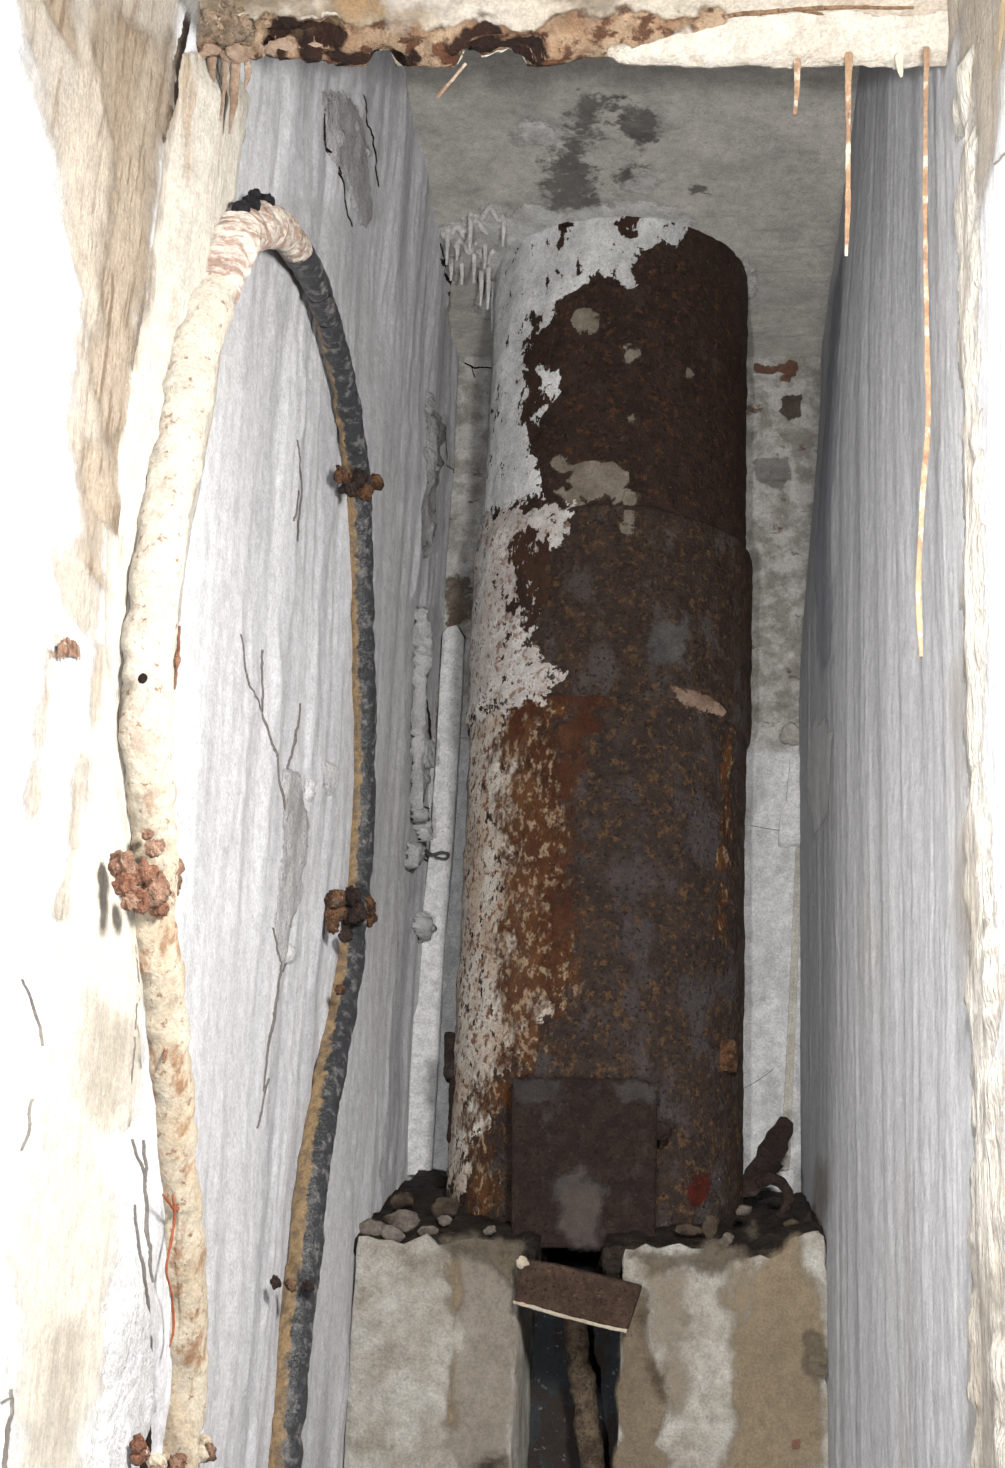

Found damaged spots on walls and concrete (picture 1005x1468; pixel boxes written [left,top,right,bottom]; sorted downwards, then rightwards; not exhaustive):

damp [387,0,459,15]
spalling [196,5,729,68]
crack [667,5,914,21]
flaking render [322,90,373,228]
corrosion [556,221,574,251]
corrosion [614,216,641,239]
corrosion [516,310,555,452]
corrosion [500,524,555,633]
damp [439,94,697,1202]
damp [610,0,1005,1468]
corrosion [460,699,580,1216]
damp [442,1235,521,1468]